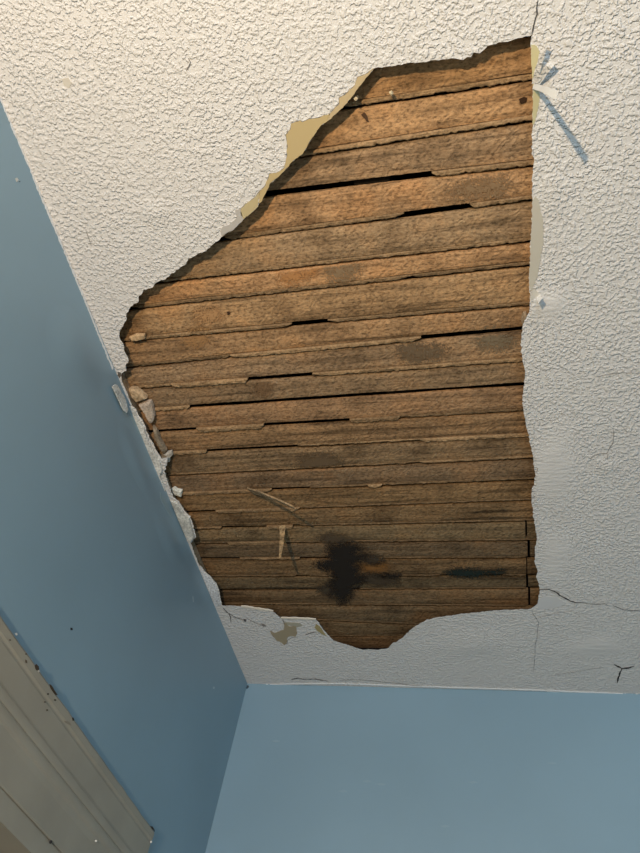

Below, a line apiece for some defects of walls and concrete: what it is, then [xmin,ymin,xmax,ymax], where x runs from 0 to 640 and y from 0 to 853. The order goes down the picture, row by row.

peeling [221,68,374,236]
spalling [529,196,544,303]
spalling [129,406,166,491]
spalling [171,500,194,543]
spalling [200,570,221,607]
leakage [312,532,405,607]
leakage [442,566,507,581]
peeling [262,617,326,645]
crack [533,589,637,683]